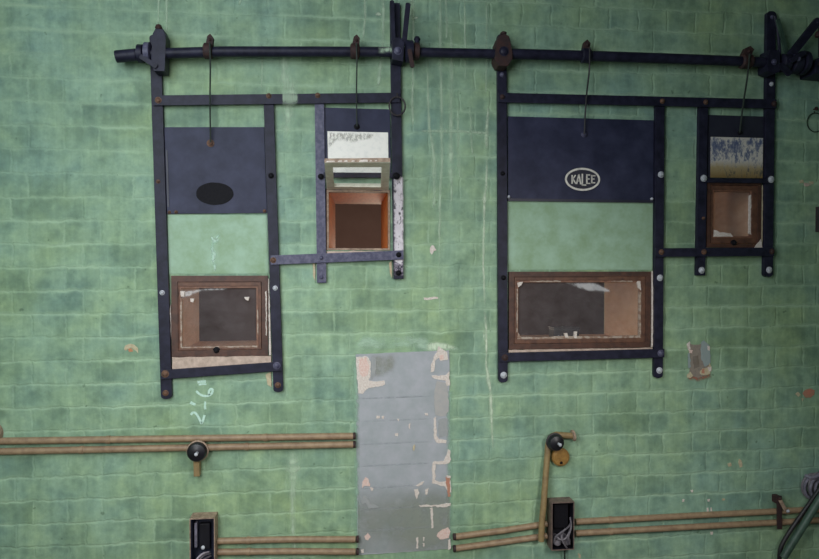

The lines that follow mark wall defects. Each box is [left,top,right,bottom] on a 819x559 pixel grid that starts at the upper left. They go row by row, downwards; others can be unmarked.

peeling [356,356,385,394]
flaking render [687,341,712,380]
peeling [414,346,451,550]